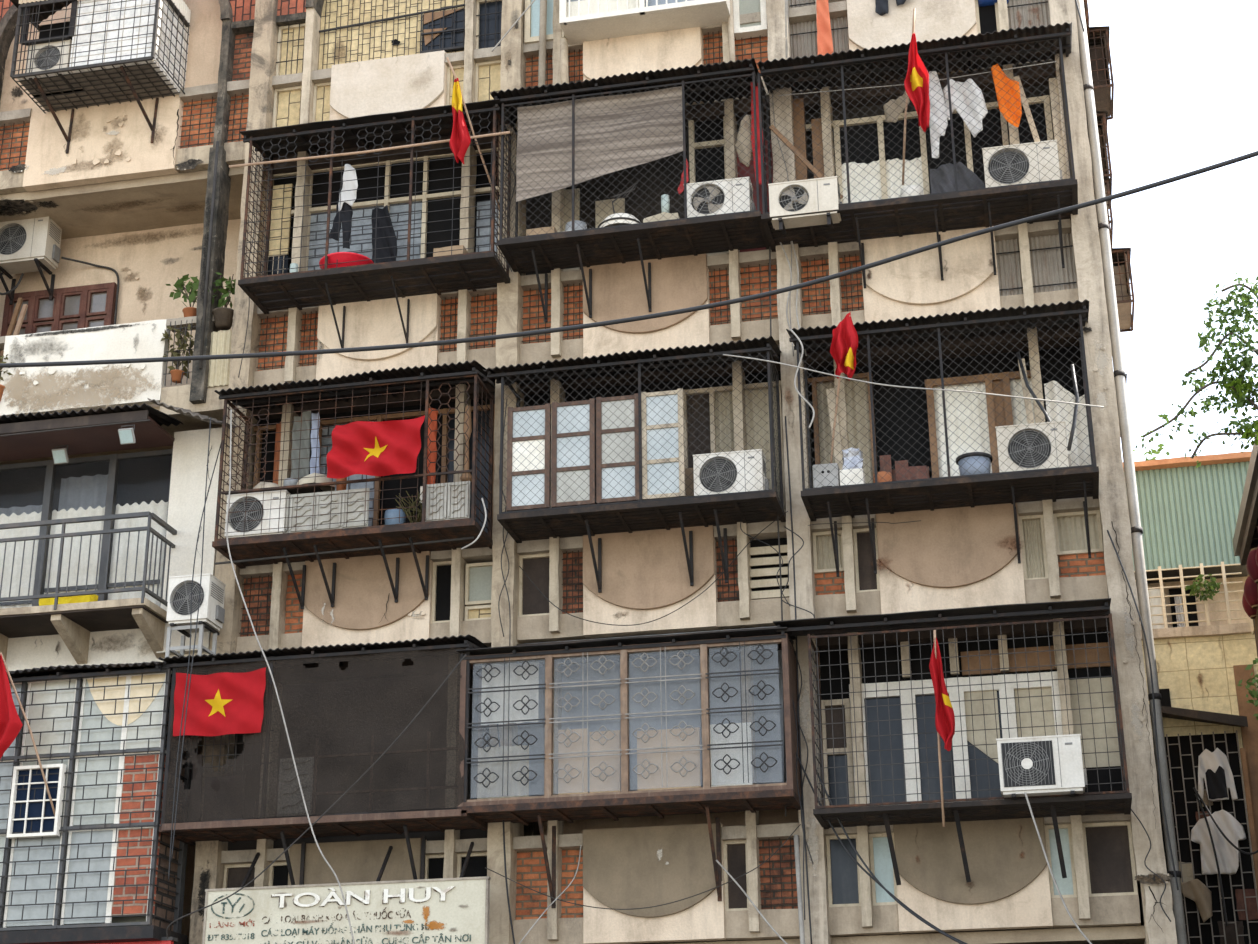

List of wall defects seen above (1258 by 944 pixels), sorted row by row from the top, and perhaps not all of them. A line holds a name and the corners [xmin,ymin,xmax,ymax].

leakage [178,198,210,328]
peeling [3,363,155,413]